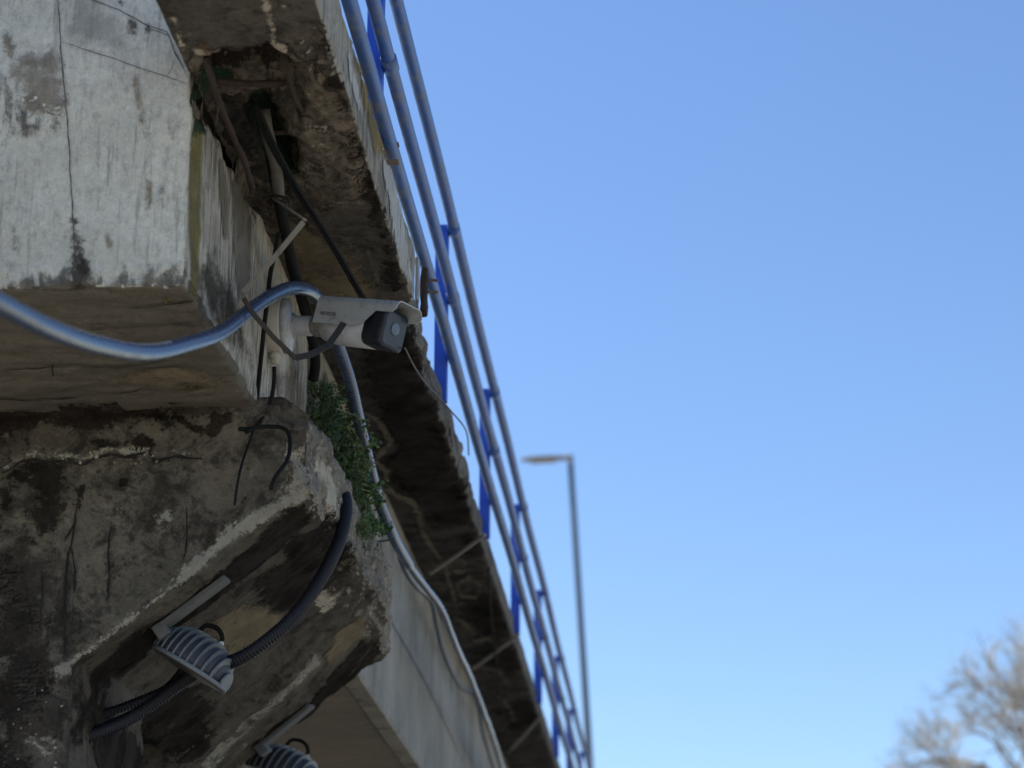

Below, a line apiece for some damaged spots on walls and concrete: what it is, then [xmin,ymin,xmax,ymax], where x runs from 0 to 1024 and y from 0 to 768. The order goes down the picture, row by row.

leakage [2,77,40,136]
crack [45,0,188,288]
spalling [187,42,368,206]
leakage [4,159,252,324]
spalling [1,446,202,473]
spalling [54,452,341,678]
spalling [326,618,366,665]